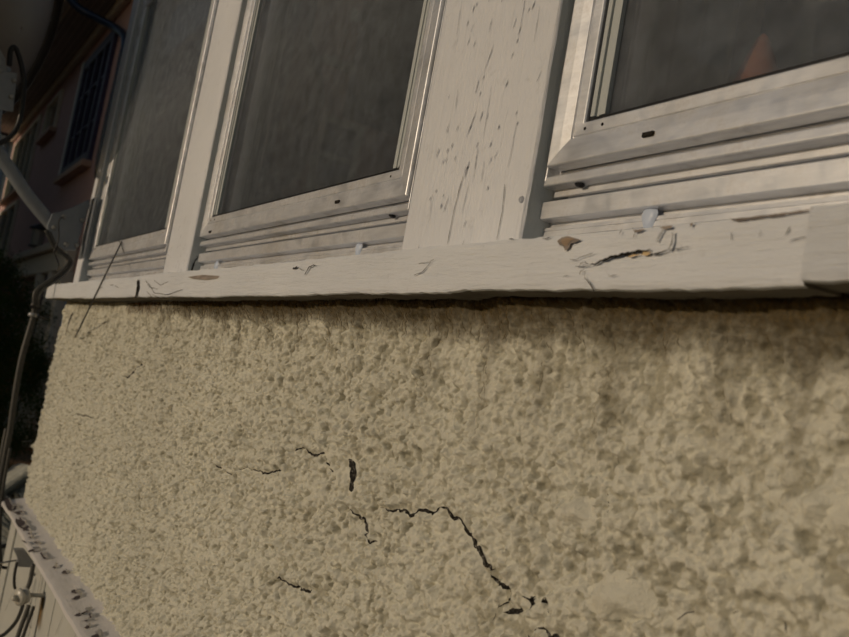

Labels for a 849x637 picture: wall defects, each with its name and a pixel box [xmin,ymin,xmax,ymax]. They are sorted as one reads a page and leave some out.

spalling [557,236,580,250]
crack [563,231,686,292]
crack [216,465,281,475]
peeling [4,496,69,574]
crack [295,447,513,620]
crack [277,576,312,593]
peeling [74,607,102,637]
crack [528,627,560,637]